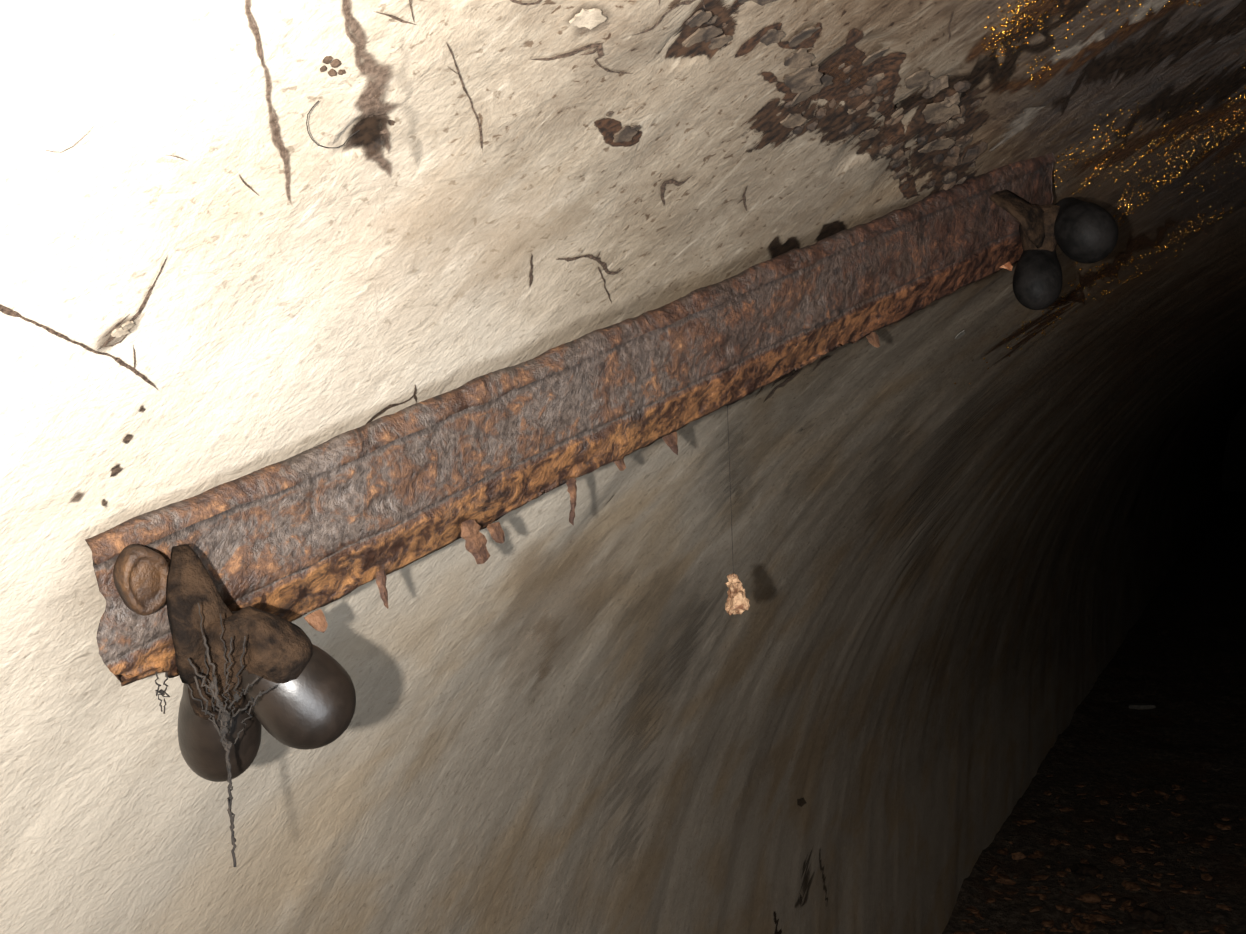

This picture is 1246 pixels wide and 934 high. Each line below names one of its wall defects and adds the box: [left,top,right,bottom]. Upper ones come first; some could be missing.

leakage [342,0,397,174]
flaking render [594,111,642,147]
flaking render [665,0,991,200]
leakage [899,0,1105,109]
leakage [990,0,1246,151]
crack [0,255,168,390]
corrosion [662,432,678,455]
corrosion [304,609,328,633]
corrosion [376,570,389,609]
corrosion [460,519,505,564]